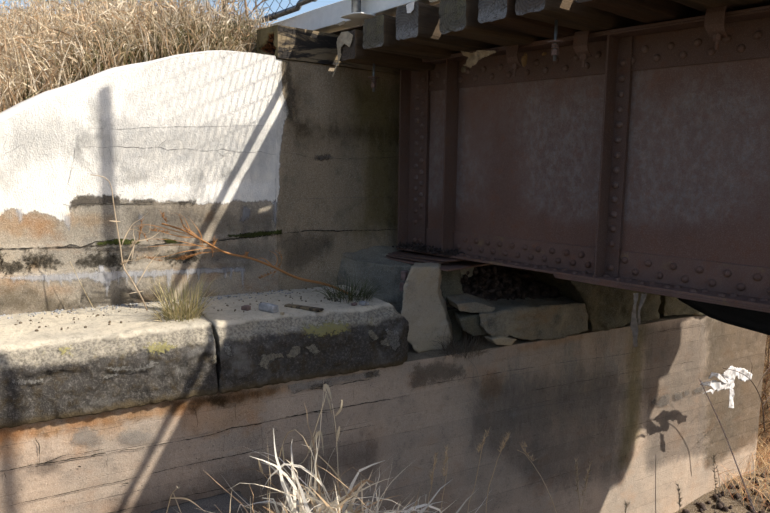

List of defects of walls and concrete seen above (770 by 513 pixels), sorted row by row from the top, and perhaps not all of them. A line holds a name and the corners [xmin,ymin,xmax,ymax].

peeling [0,51,289,227]
crack [51,127,276,206]